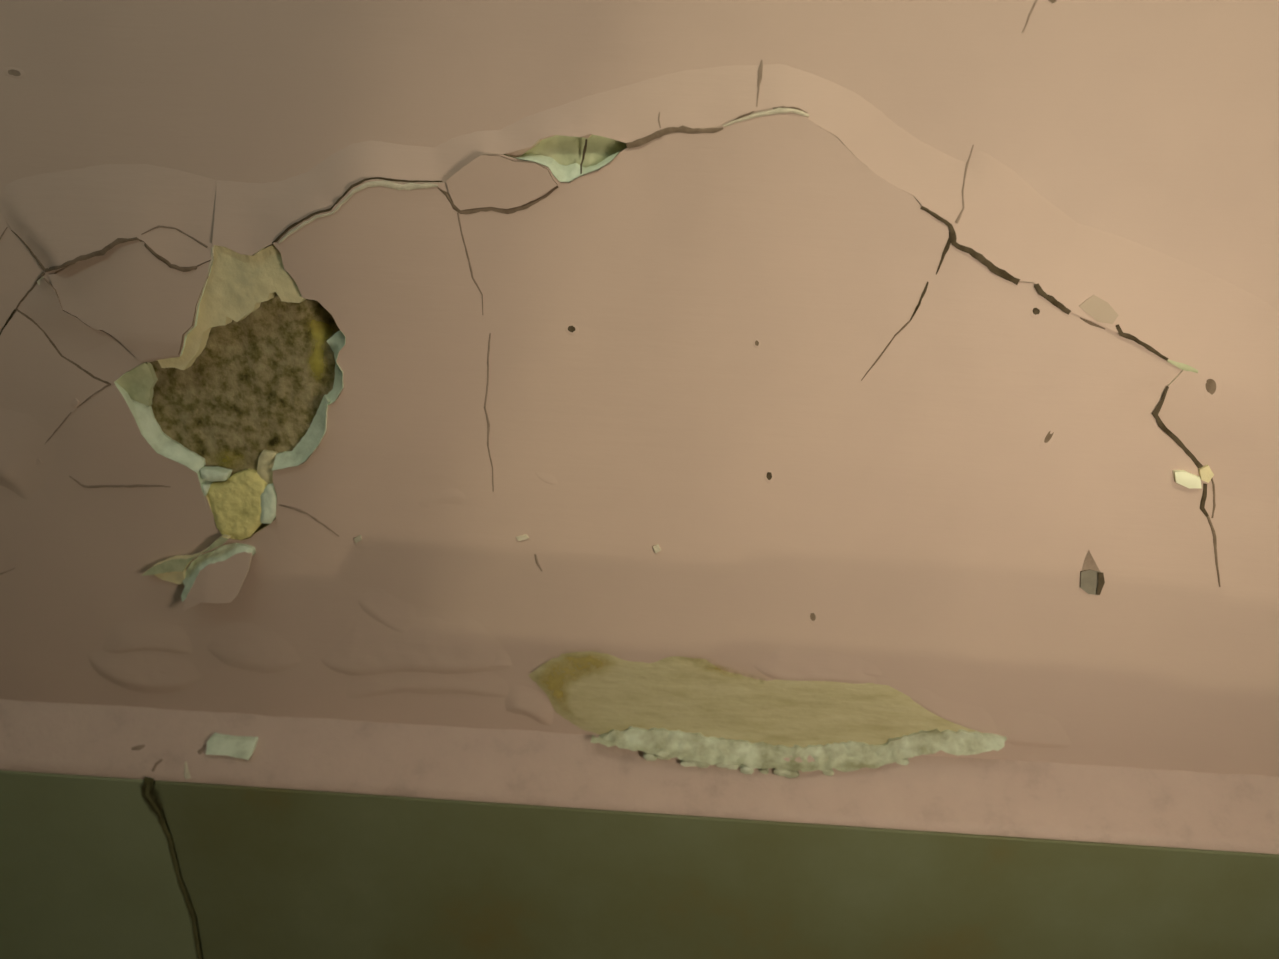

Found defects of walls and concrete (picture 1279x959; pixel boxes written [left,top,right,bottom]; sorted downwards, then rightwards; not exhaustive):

peeling [446,135,627,210]
crack [626,60,809,149]
crack [0,225,208,445]
spalling [116,244,346,613]
crack [272,177,558,492]
crack [861,145,1221,587]
crack [279,504,339,537]
flaking render [528,651,1007,778]
crack [142,777,202,959]